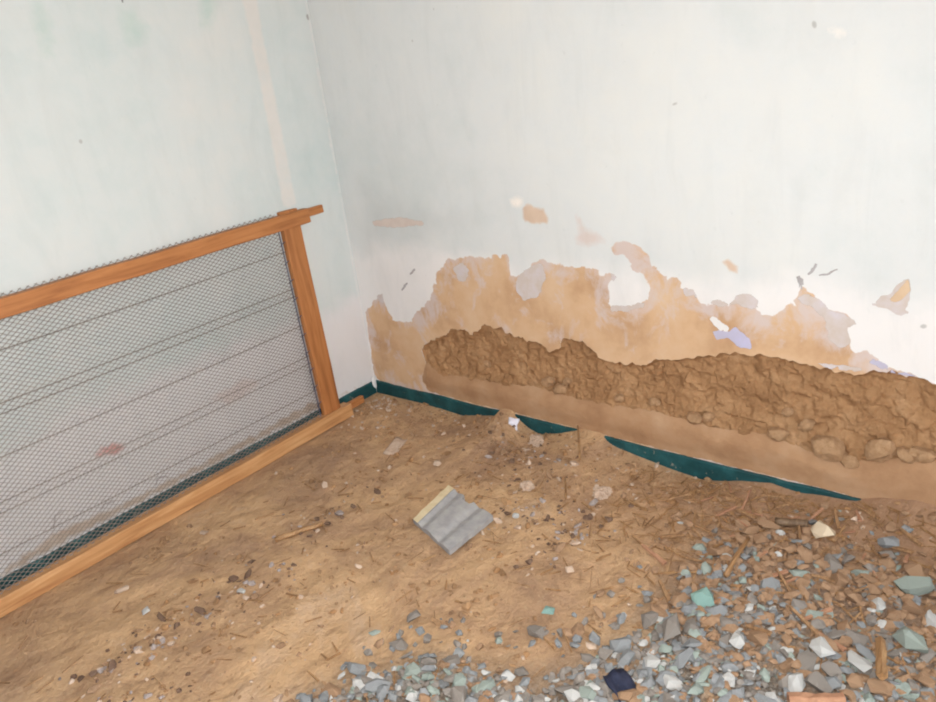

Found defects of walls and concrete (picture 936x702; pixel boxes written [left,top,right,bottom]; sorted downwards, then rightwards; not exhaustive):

peeling [507,193,549,226]
peeling [338,238,936,410]
peeling [0,400,321,579]
peeling [693,457,846,495]